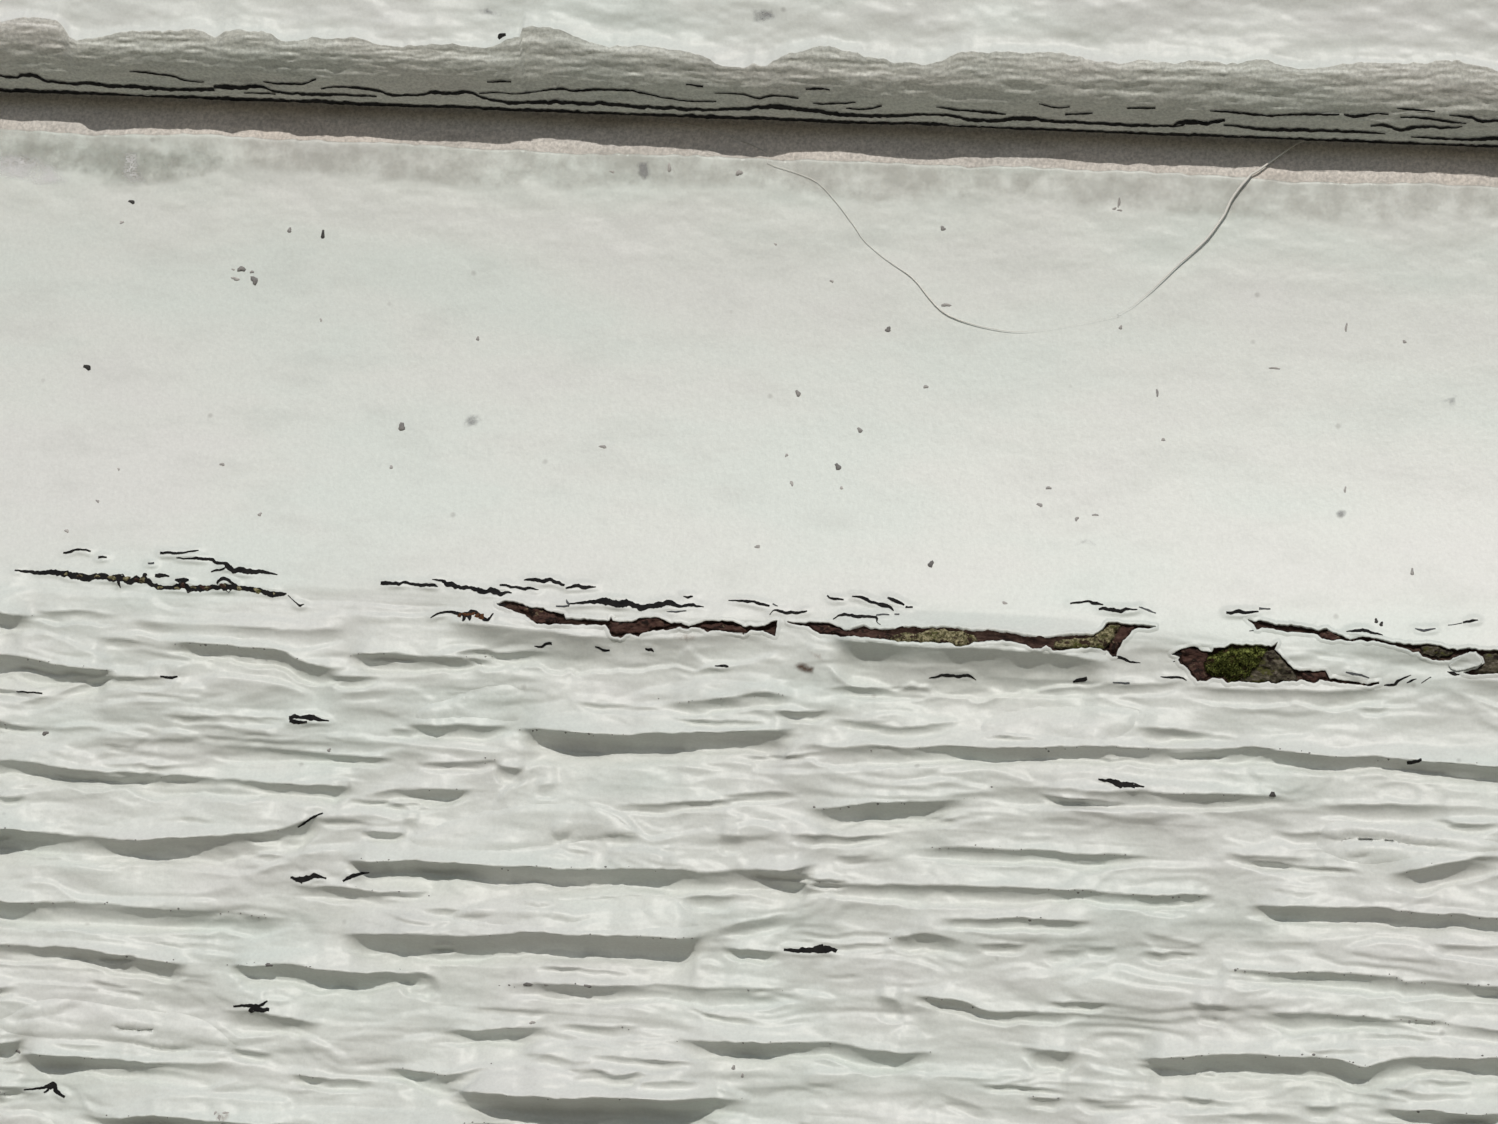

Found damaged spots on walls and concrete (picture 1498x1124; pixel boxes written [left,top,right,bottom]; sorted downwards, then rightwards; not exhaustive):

crack [0,71,1498,141]
peeling [493,597,1159,663]
peeling [1167,616,1498,691]